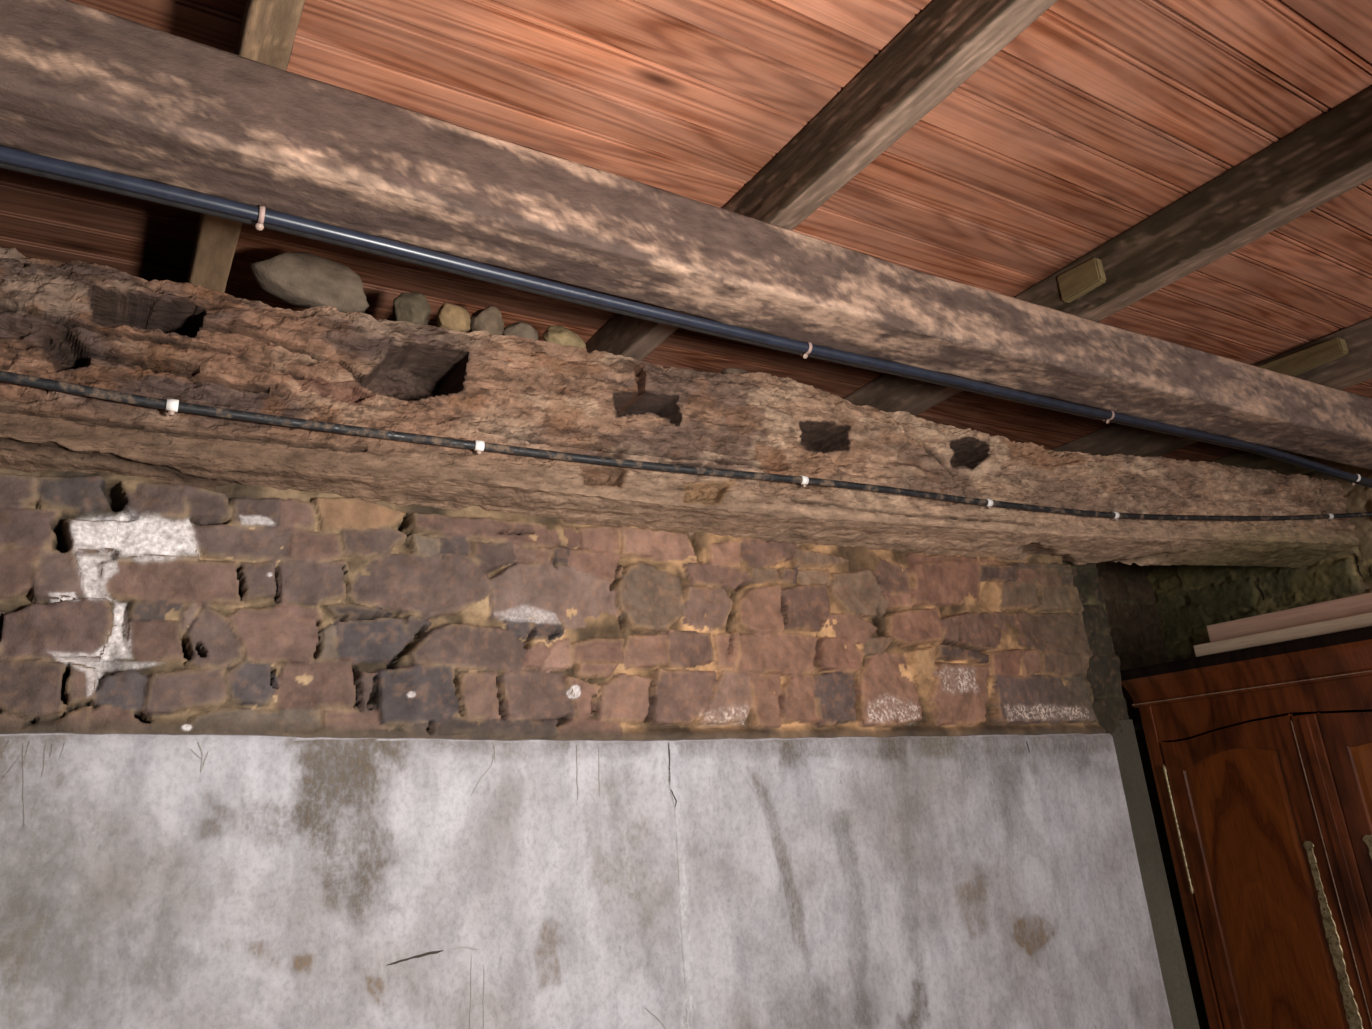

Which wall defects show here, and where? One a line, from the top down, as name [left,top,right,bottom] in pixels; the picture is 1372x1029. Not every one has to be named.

damp [55,515,198,601]
damp [93,605,130,660]
damp [868,697,919,722]
damp [1011,704,1089,720]
damp [304,738,401,836]